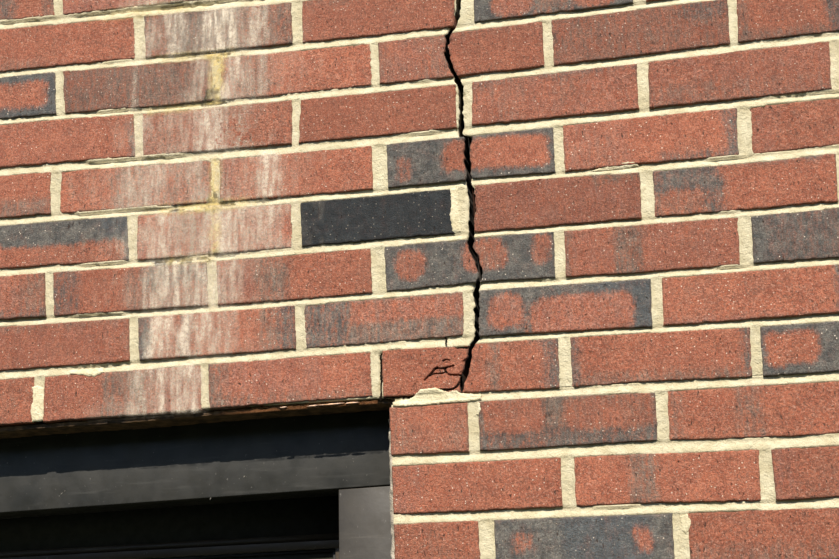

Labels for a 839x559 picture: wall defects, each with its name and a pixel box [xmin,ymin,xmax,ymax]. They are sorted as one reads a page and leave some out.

crack [429,0,480,393]